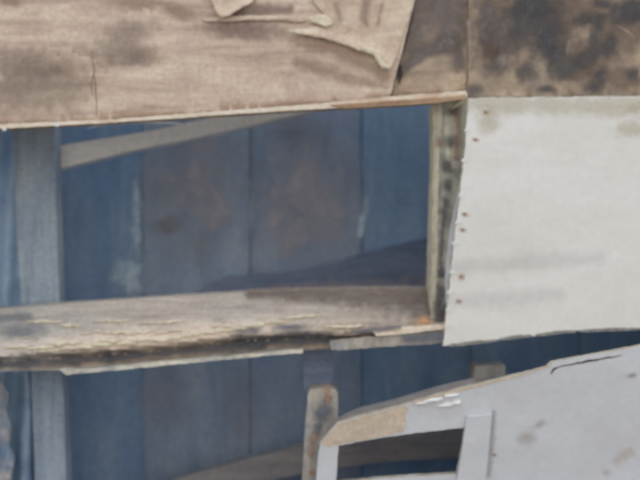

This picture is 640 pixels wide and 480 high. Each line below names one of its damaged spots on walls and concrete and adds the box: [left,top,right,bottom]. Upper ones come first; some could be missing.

peeling [362,46,392,69]
damp [396,0,640,93]
damp [439,198,448,277]
crack [551,355,622,374]
peeling [321,366,551,447]